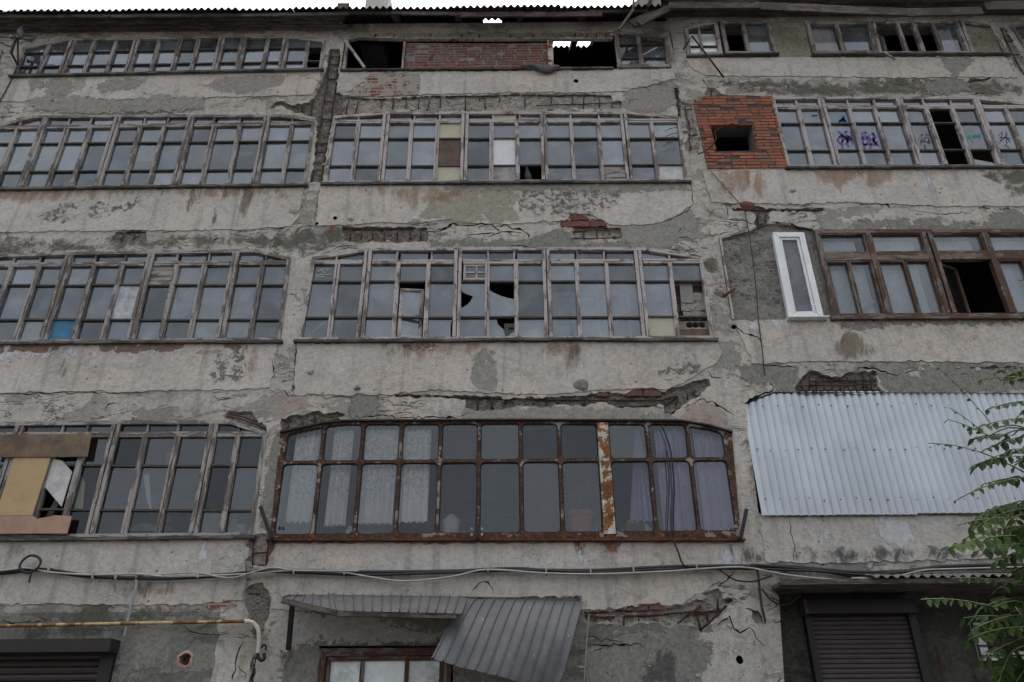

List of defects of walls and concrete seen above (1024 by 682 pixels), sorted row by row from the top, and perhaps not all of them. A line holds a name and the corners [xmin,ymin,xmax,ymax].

spalling [28,26,623,183]
peeling [39,196,141,224]
crack [428,221,560,247]
peeling [342,184,708,250]
crack [856,203,964,222]
peeling [210,344,246,383]
spalling [394,340,1024,428]
peeling [214,393,380,570]
peeling [202,582,451,682]
crack [588,636,643,651]
crack [717,608,766,645]